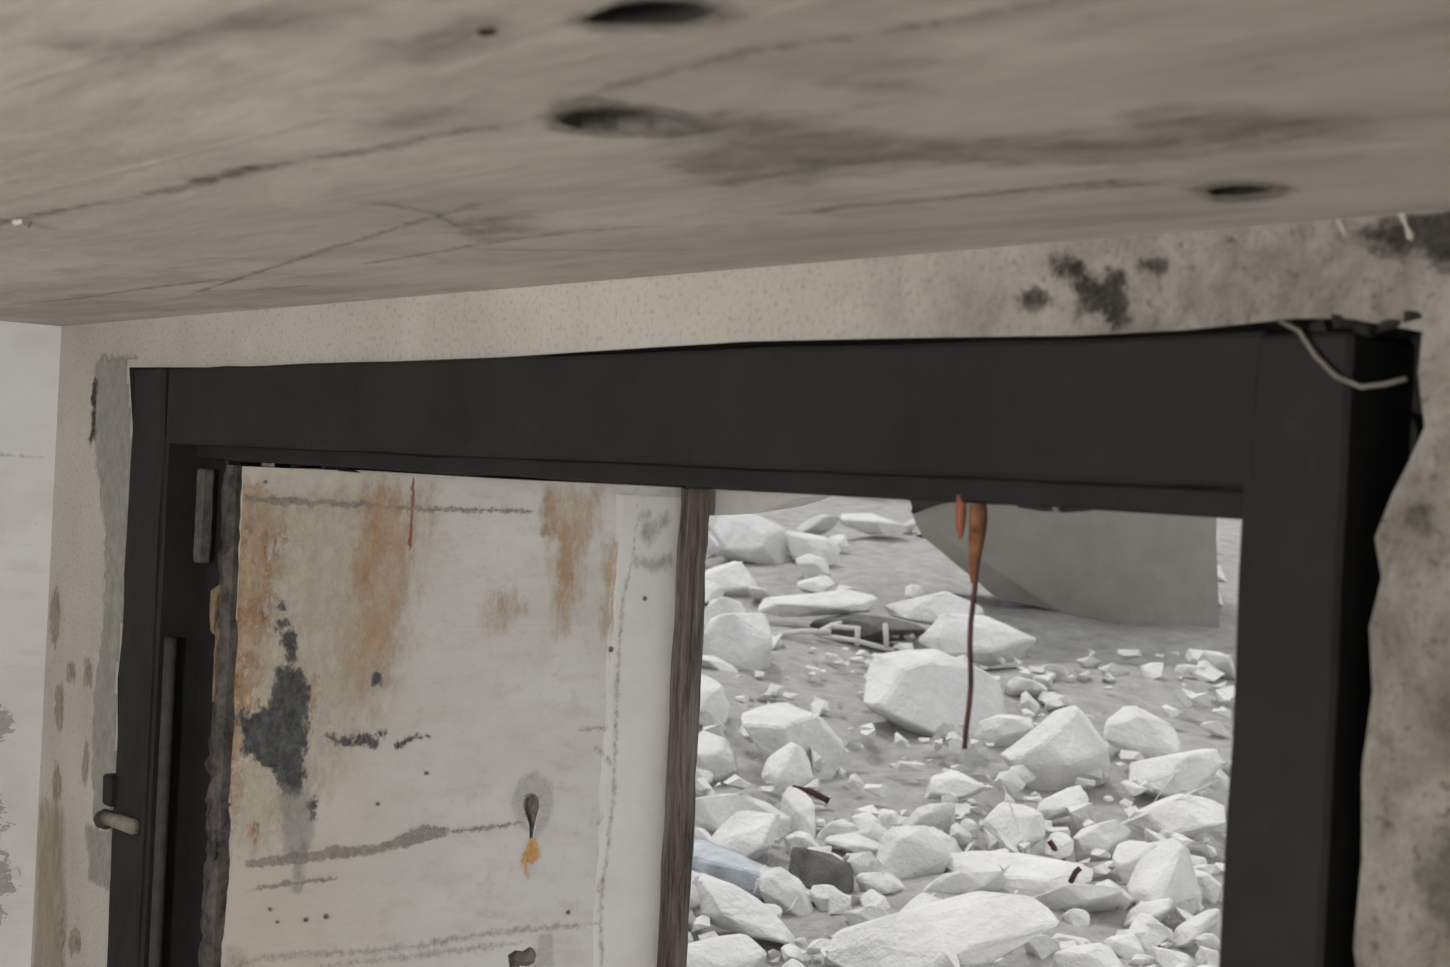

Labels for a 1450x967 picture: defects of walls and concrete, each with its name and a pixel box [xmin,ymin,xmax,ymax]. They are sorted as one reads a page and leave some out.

spalling [578,0,729,31]
spalling [546,98,707,138]
damp [1360,212,1450,271]
damp [1140,260,1166,273]
damp [1018,288,1047,310]
damp [1051,257,1130,330]
rust [955,494,967,539]
rust [229,484,287,813]
peeling [0,704,17,742]
damp [235,602,317,821]
damp [328,731,430,749]
peeling [0,794,20,922]